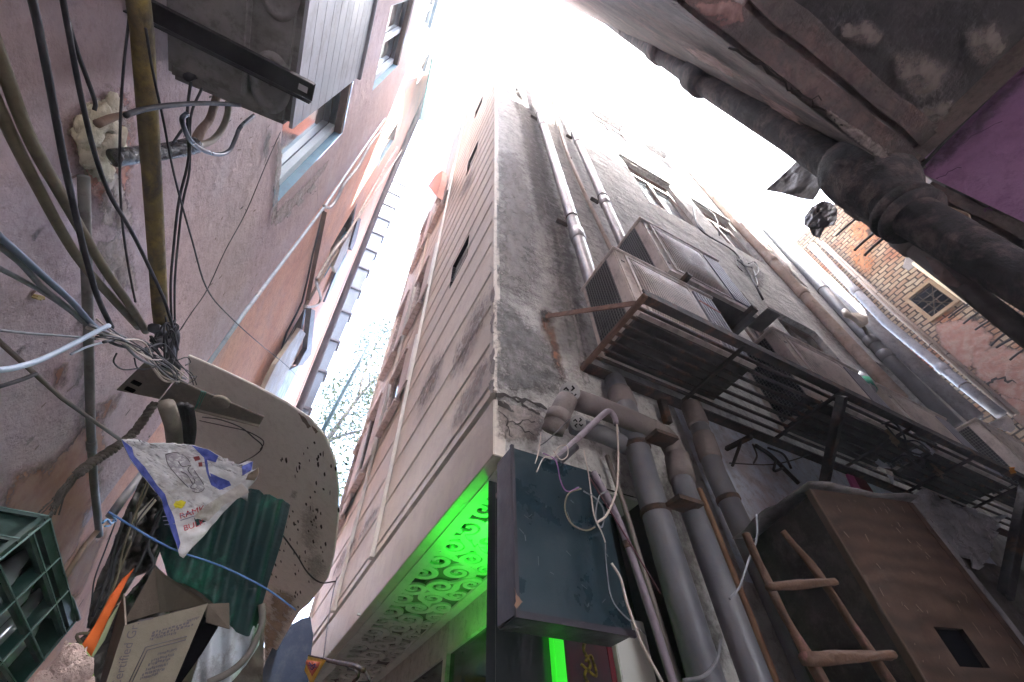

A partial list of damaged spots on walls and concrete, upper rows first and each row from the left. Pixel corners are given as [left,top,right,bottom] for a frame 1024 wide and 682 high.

damp [516,87,589,382]
crack [496,392,547,437]
rust [541,310,563,380]
peeling [936,314,1024,427]